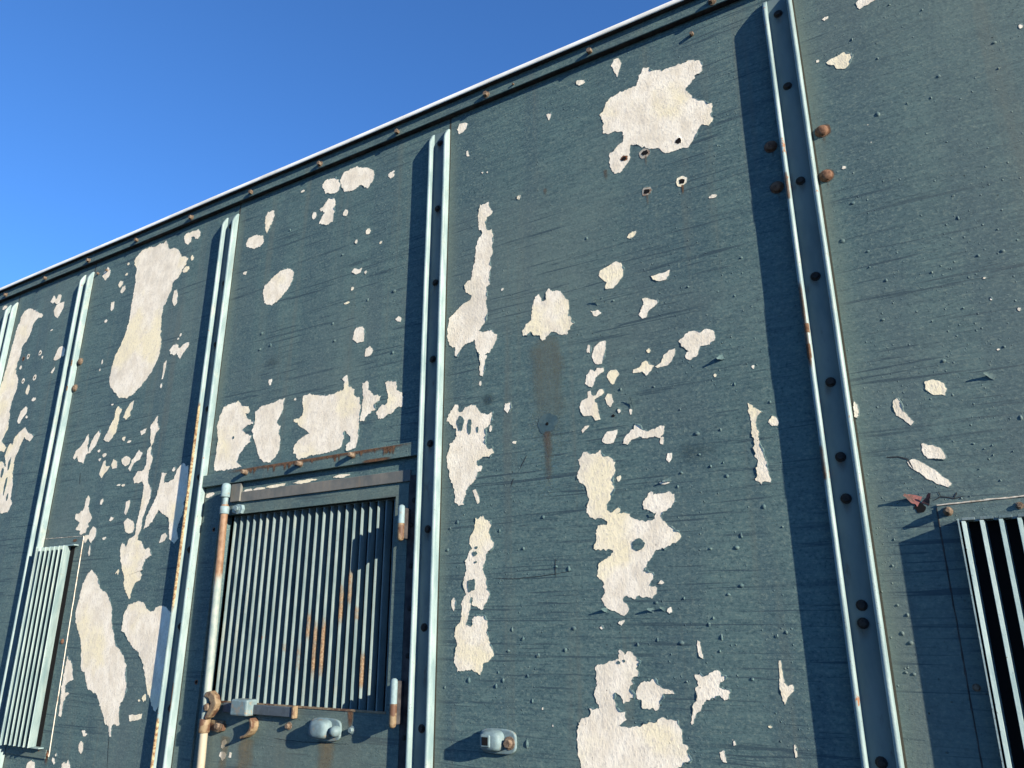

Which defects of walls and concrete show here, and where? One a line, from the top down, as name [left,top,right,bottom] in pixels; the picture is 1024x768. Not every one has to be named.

peeling [599,58,714,174]
peeling [446,202,504,386]
peeling [521,288,575,341]
peeling [0,294,66,514]
peeling [58,229,201,737]
peeling [214,375,404,472]
corrosion [306,617,327,672]
corrosion [238,444,400,472]
corrosion [338,573,358,621]
peeling [446,402,512,676]
peeling [576,328,716,626]
peeling [576,649,731,768]